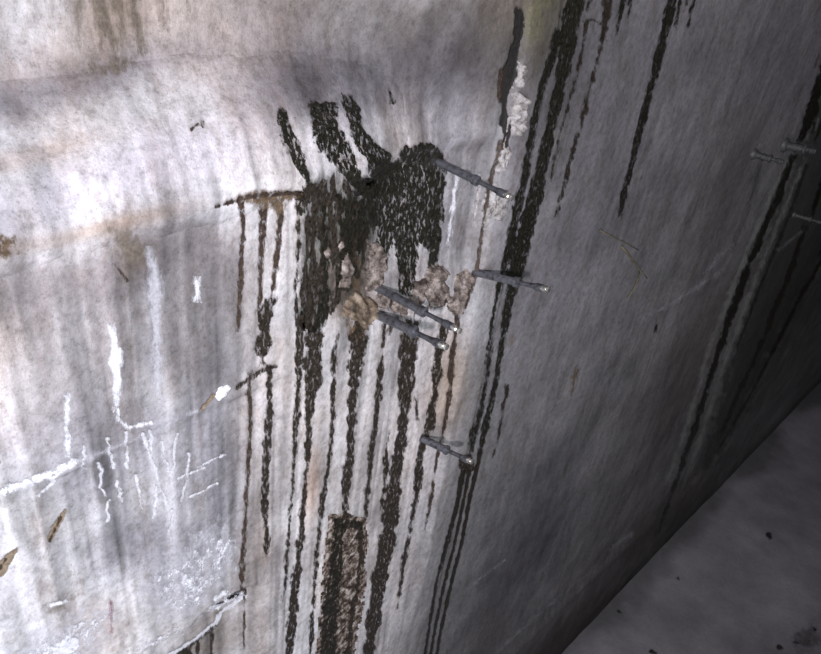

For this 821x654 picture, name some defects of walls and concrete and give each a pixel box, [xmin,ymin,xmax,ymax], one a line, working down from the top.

corrosion [0,235,19,258]
damp [235,297,278,647]
damp [277,93,460,654]
spalling [320,238,475,347]
spalling [474,61,532,228]
damp [424,0,632,654]
damp [618,0,696,218]
damp [657,66,821,533]